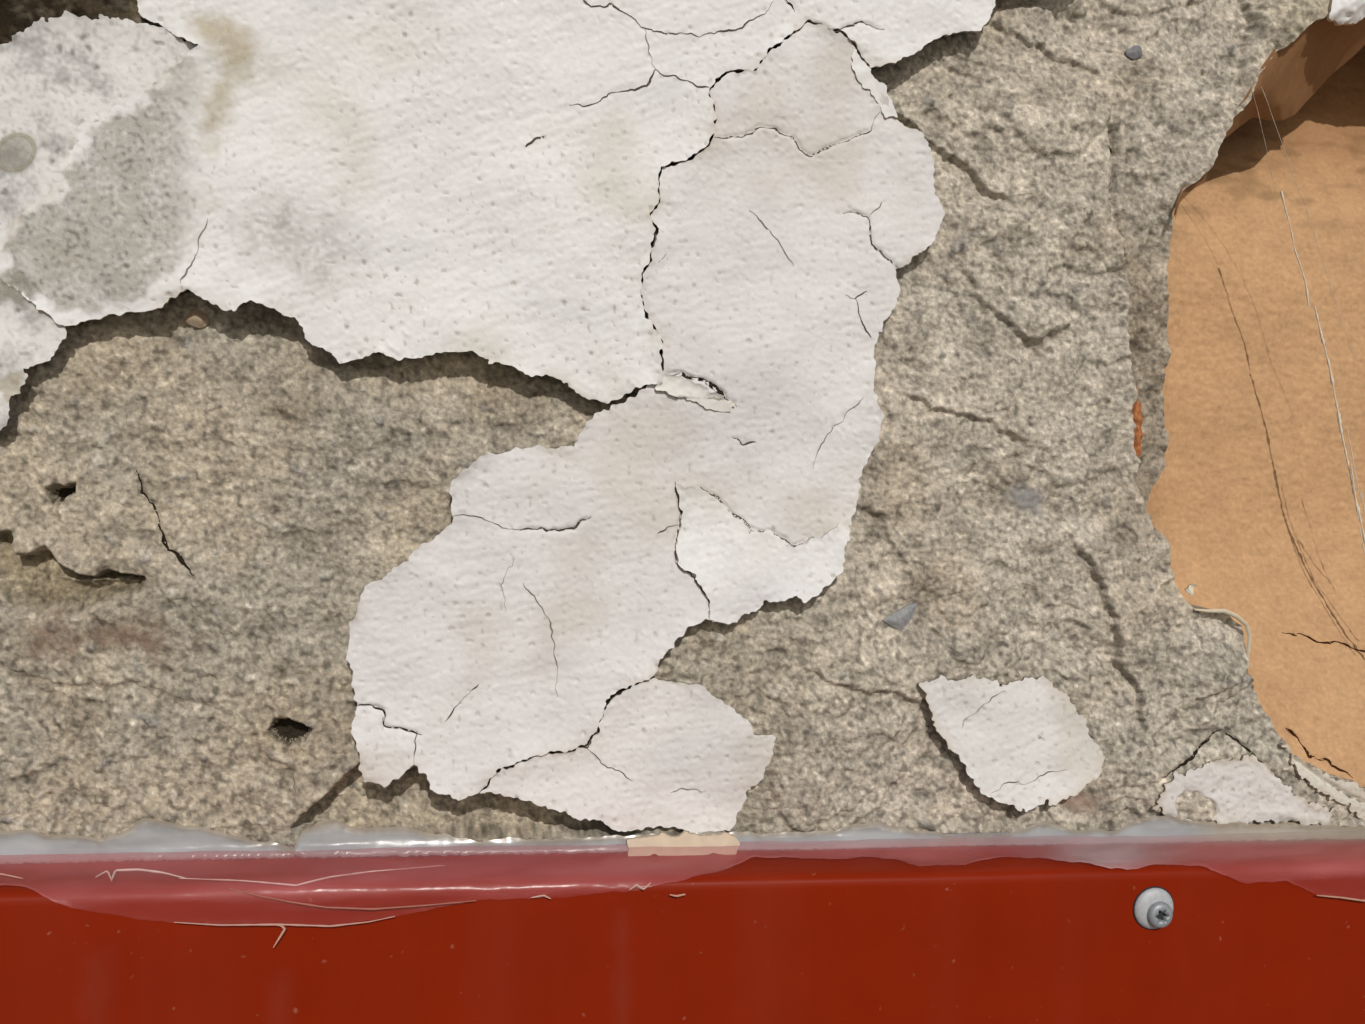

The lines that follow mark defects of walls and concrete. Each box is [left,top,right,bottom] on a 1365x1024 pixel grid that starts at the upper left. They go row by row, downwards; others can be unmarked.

crack [574,0,880,445]
crack [846,202,900,270]
peeling [0,0,996,856]
crack [813,397,864,466]
spalling [651,0,1365,834]
crack [136,470,195,576]
crack [1282,632,1365,652]